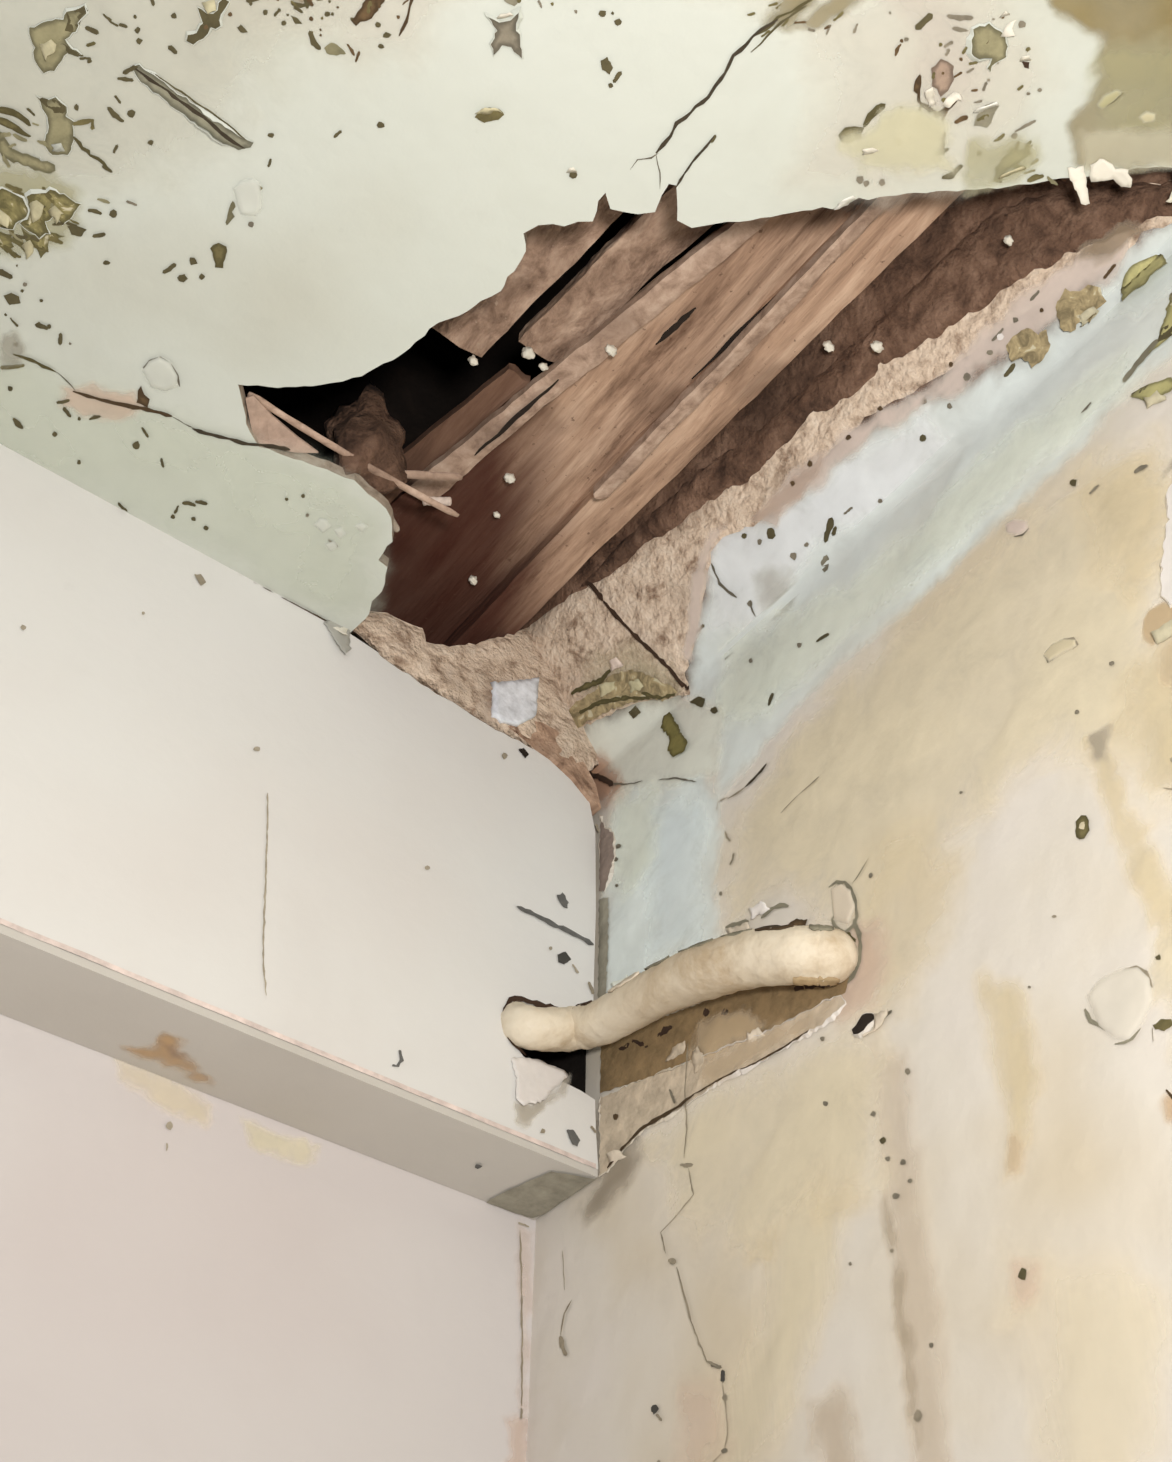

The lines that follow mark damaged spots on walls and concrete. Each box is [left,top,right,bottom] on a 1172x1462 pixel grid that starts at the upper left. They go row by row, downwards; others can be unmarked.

peeling [747,2,858,37]
spalling [323,11,1172,772]
peeling [170,500,209,530]